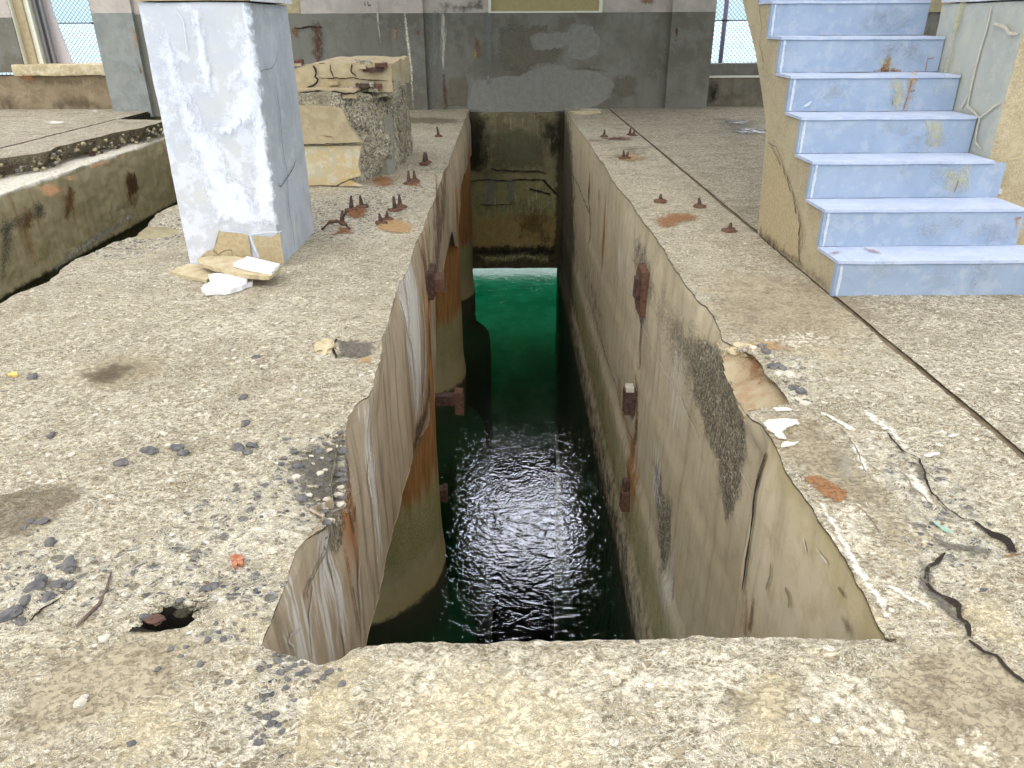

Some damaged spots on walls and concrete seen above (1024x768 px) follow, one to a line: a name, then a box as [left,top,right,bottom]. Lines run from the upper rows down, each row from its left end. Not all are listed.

peeling [467,23,615,113]
rust [881,57,918,110]
spalling [0,124,163,178]
rust [127,171,139,204]
crack [261,40,385,243]
rust [333,208,367,235]
crack [472,168,589,212]
spalling [716,342,811,424]
crack [742,452,767,590]
rust [804,475,847,502]
crack [837,425,1019,557]
crack [885,552,1024,683]